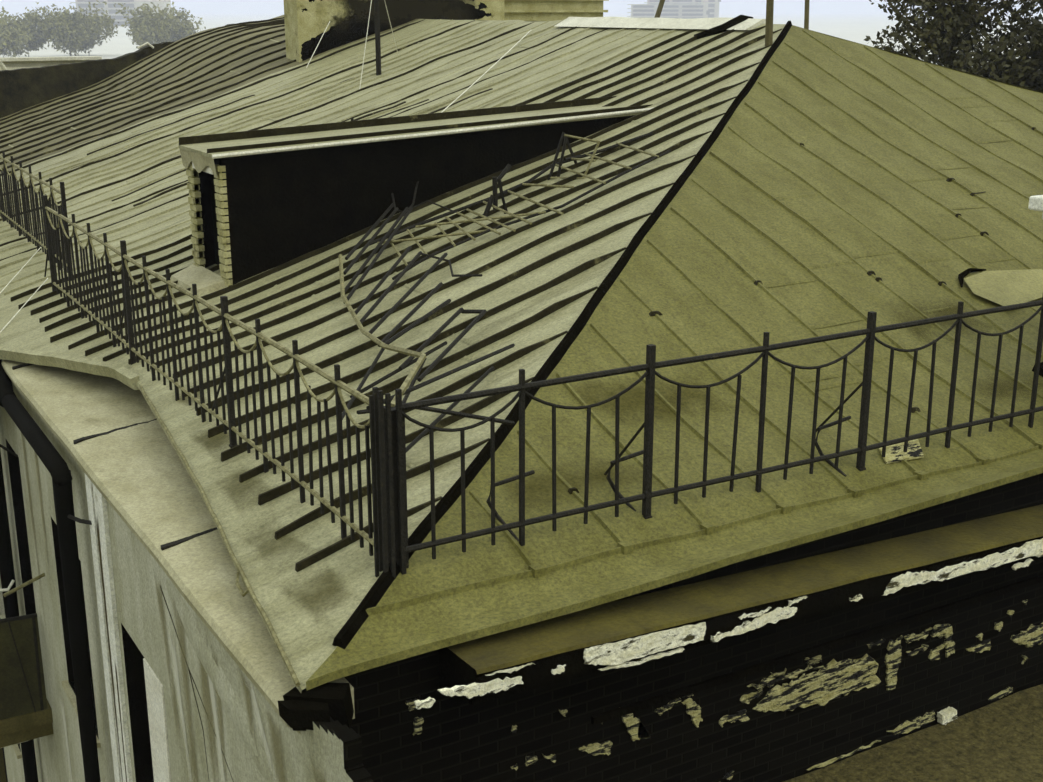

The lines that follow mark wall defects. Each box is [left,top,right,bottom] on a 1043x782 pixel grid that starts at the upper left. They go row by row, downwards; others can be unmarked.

peeling [884,538,1043,595]
peeling [583,596,807,671]
peeling [719,599,1043,727]
peeling [406,663,534,735]
peeling [511,754,556,771]
peeling [579,741,613,756]
peeling [619,707,650,741]
peeling [655,694,703,728]
peeling [807,707,958,770]